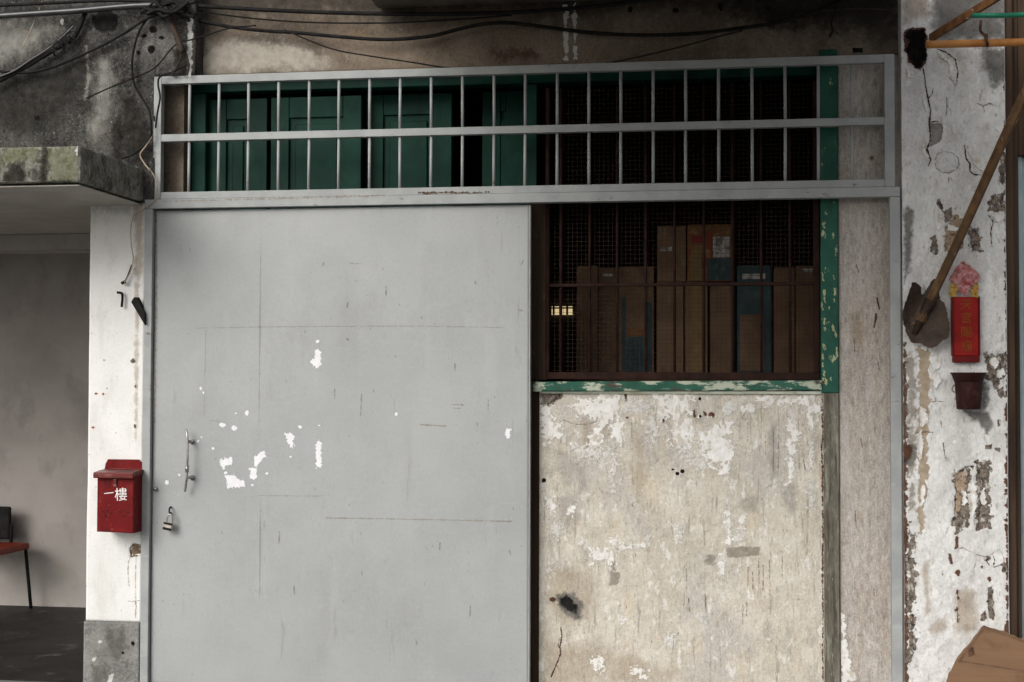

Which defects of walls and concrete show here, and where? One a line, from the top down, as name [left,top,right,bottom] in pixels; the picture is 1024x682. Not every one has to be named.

spalling [904,28,959,85]
damp [3,147,49,181]
crack [922,68,948,166]
spalling [930,123,942,147]
spalling [930,152,1006,255]
peeling [822,318,838,386]
peeling [540,393,823,509]
peeling [915,339,947,534]
spalling [951,444,1001,535]